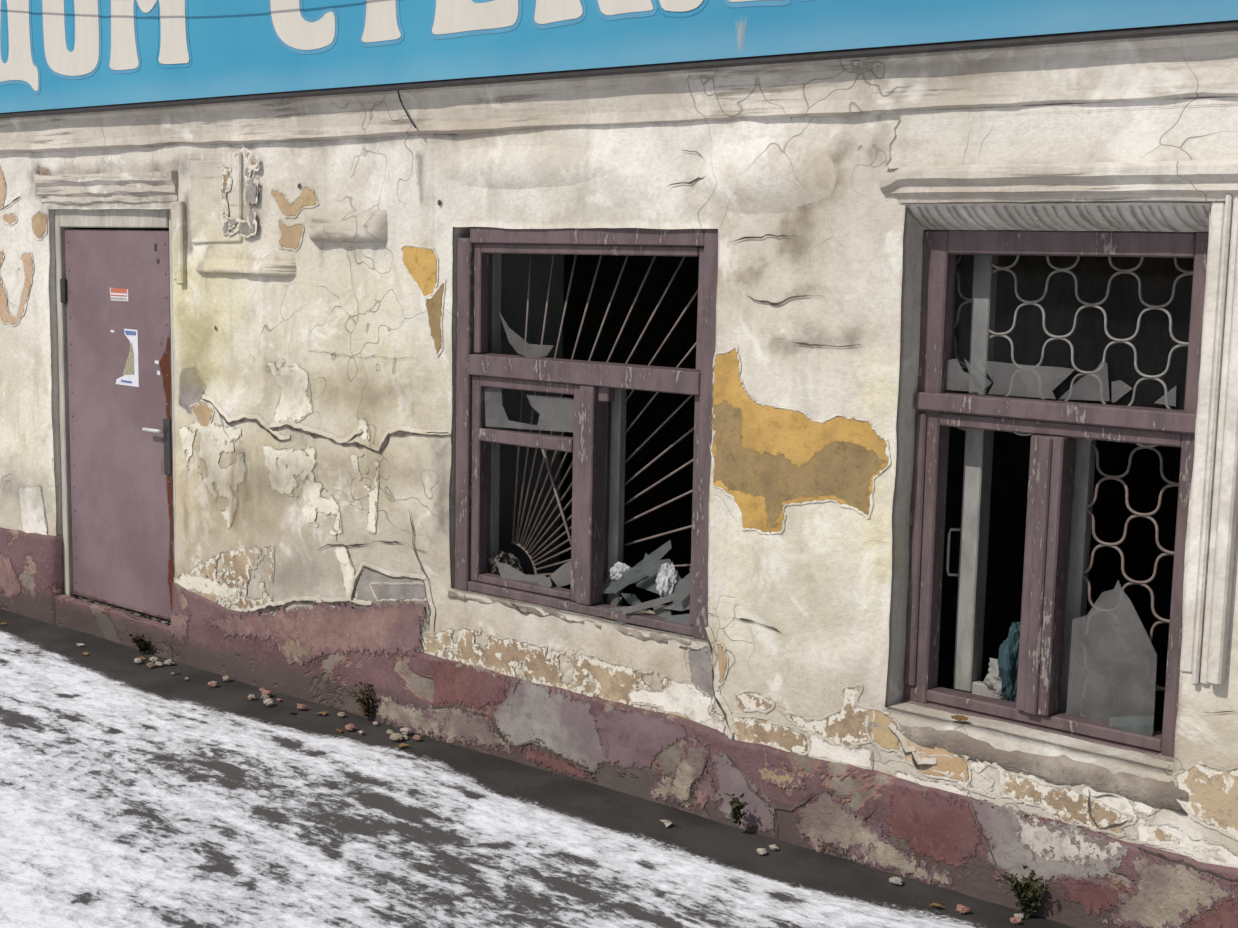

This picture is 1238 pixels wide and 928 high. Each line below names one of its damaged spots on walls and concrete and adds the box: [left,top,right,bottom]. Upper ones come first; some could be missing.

peeling [0,165,48,327]
peeling [220,147,319,251]
crack [669,150,705,186]
crack [729,234,787,242]
peeling [178,363,247,528]
peeling [266,359,313,423]
crack [202,394,451,454]
peeling [400,243,446,357]
crack [748,295,825,306]
peeling [710,345,891,534]
crack [782,338,861,347]
peeling [171,442,1238,928]